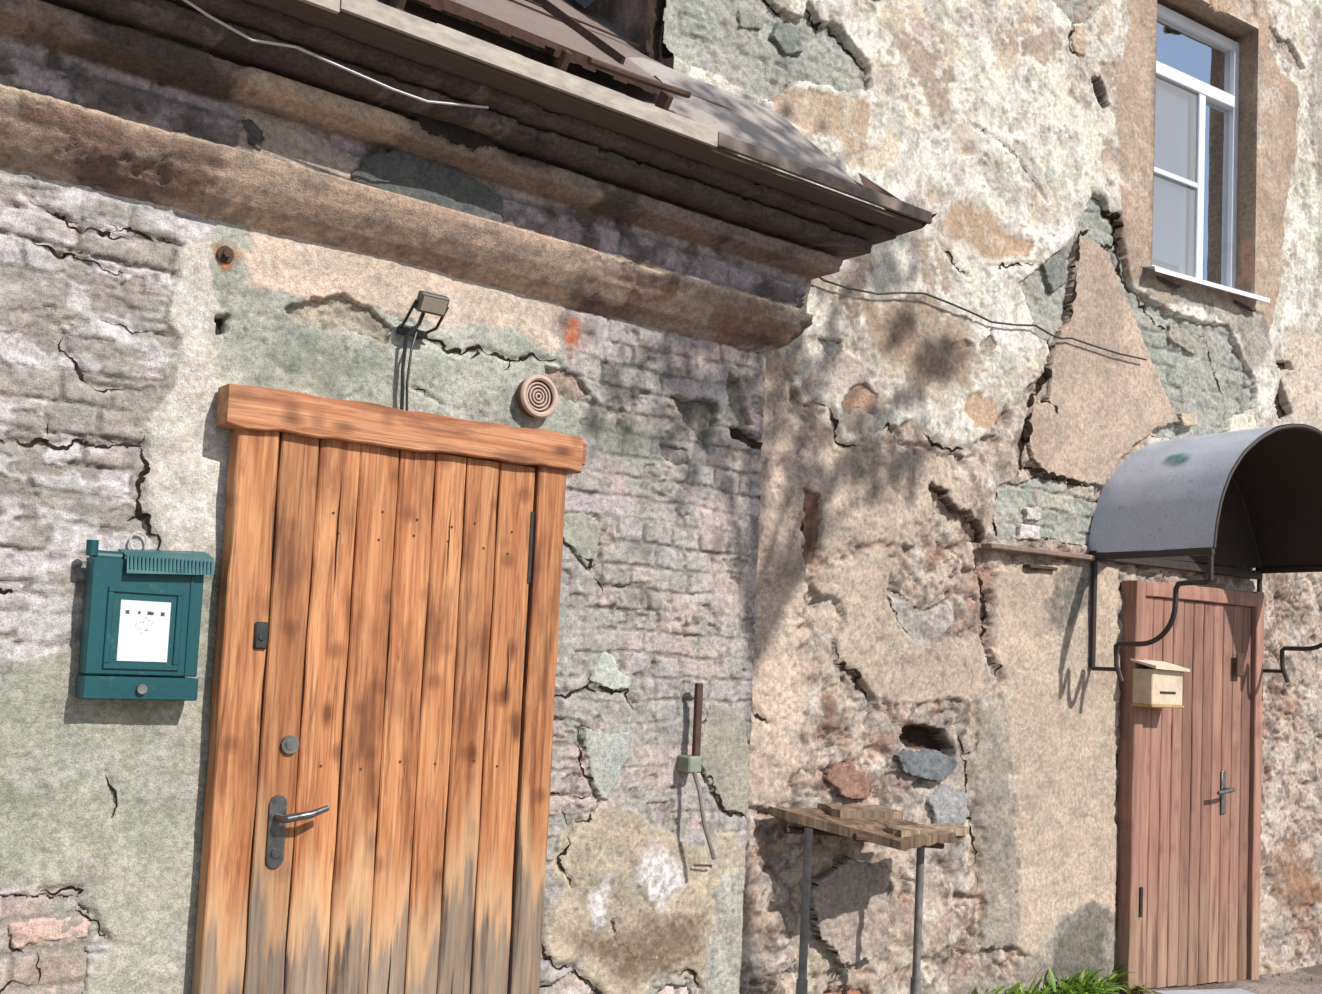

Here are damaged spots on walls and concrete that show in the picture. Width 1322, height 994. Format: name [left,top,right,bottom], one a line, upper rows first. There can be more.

spalling [645,0,866,101]
crack [30,201,177,275]
crack [409,336,576,380]
peeling [993,198,1252,546]
crack [0,424,162,550]
peeling [589,651,632,691]
peeling [578,726,630,800]
peeling [700,702,750,815]
crack [0,930,41,993]
spalling [0,894,91,994]
crack [41,885,106,939]
spalling [539,971,596,994]